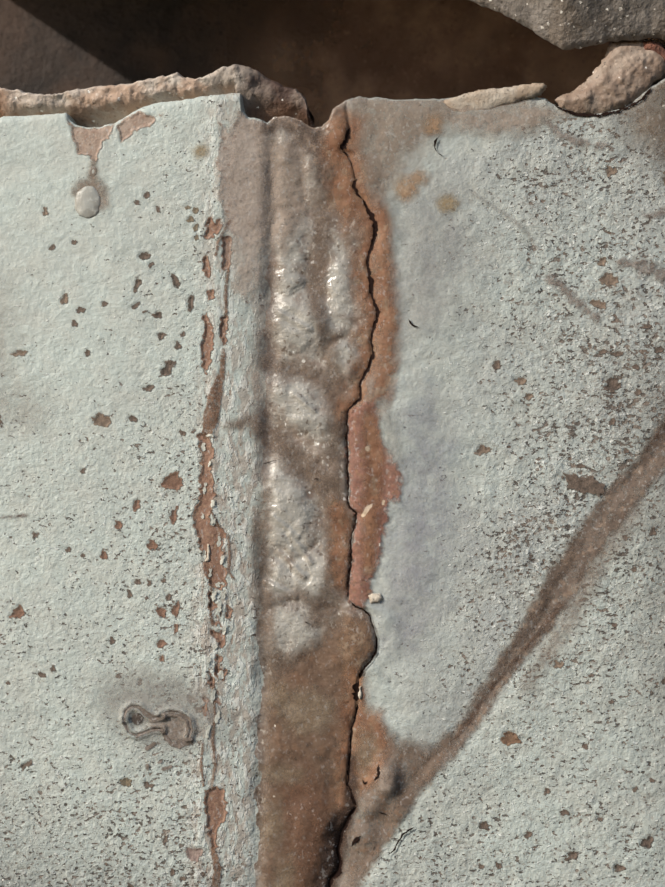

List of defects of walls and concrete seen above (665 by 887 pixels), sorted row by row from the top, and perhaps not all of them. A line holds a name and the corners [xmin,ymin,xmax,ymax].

peeling [443,83,547,112]
peeling [68,111,160,161]
peeling [131,276,162,318]
peeling [160,359,176,376]
peeling [200,312,230,375]
peeling [91,412,111,427]
corrosion [229,0,665,887]
peeling [161,471,183,492]
crack [314,127,414,887]
peeling [179,429,233,738]
peeling [156,593,180,634]
peeling [186,786,228,862]